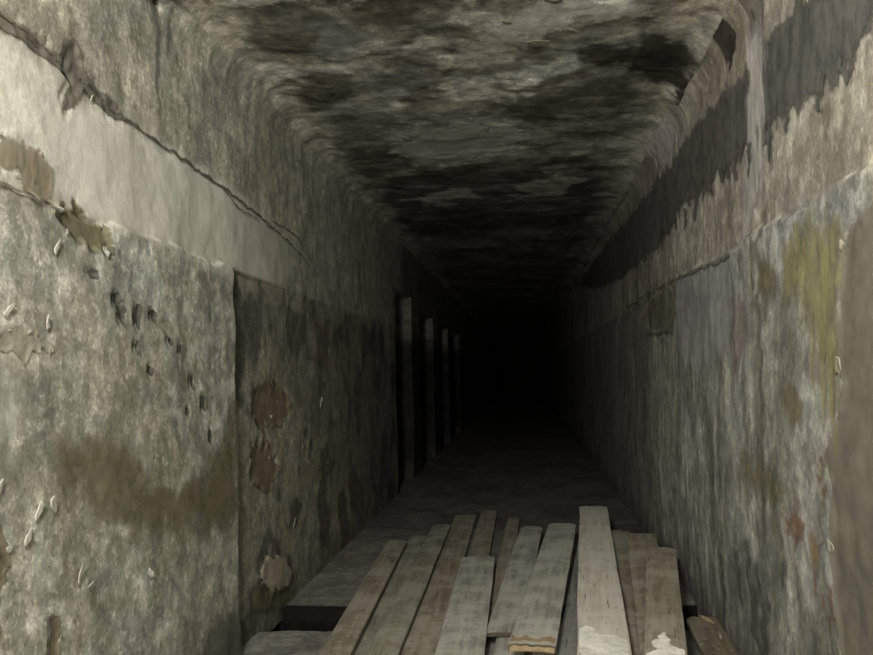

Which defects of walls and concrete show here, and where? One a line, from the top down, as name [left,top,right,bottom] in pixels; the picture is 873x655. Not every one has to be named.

peeling [0,131,115,259]
crack [0,12,309,265]
spalling [113,291,156,328]
leakage [577,0,873,537]
peeling [0,495,58,589]
spalling [55,415,240,543]
peeling [48,613,65,655]